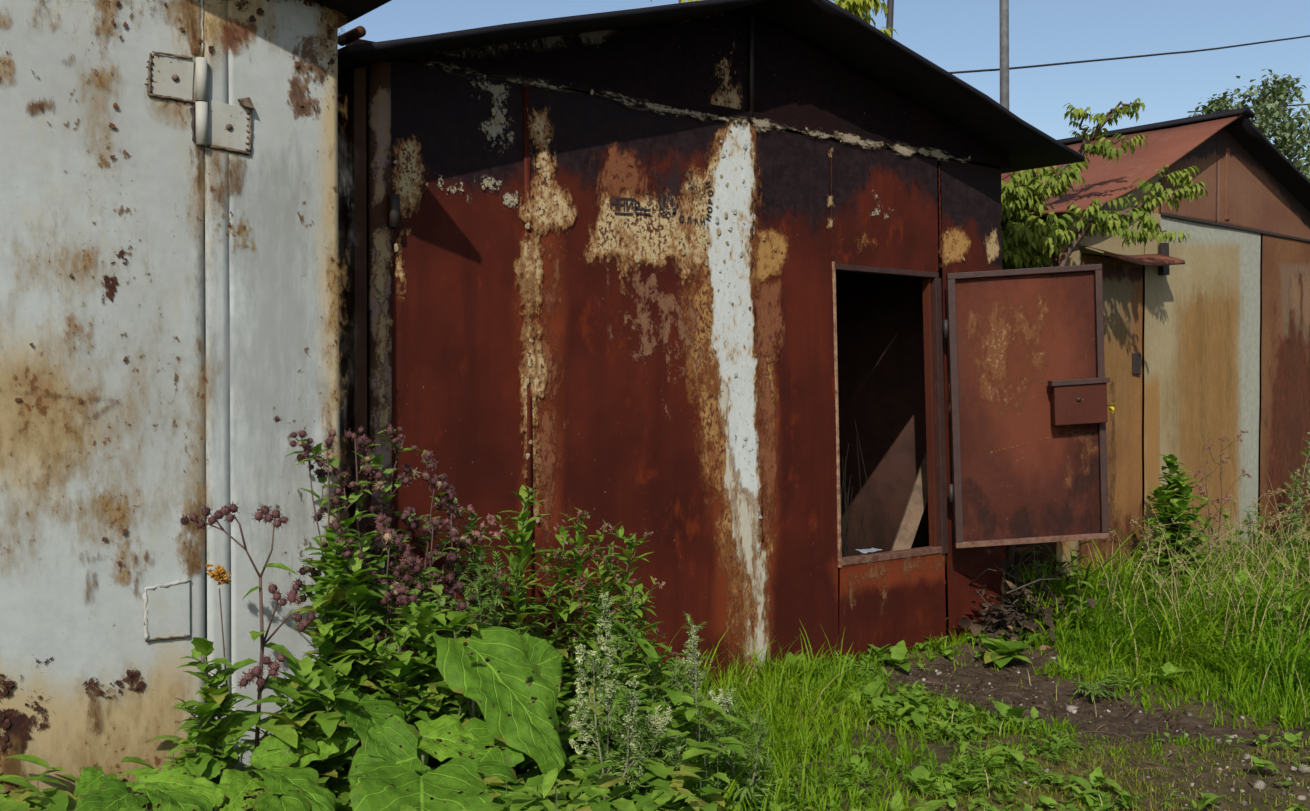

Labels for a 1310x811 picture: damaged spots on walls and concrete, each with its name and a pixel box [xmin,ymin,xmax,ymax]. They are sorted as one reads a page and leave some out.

rust [27,0,275,177]
rust [285,0,342,120]
rust [1,315,148,600]
rust [27,180,152,305]
rust [120,333,210,577]
rust [371,225,393,529]
peeling [392,60,577,526]
rust [613,265,713,384]
rust [753,228,788,596]
peeling [584,42,971,675]
rust [0,656,53,794]
rust [67,667,146,795]